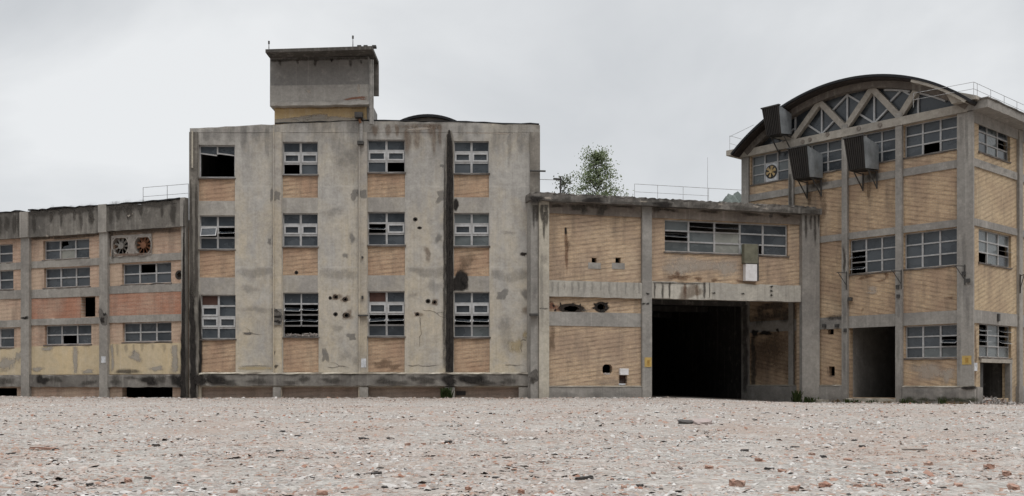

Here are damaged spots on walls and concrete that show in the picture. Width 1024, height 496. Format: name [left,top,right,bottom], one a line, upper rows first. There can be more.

damp [31,184,236,398]
damp [377,130,513,391]
spalling [549,302,609,313]
damp [530,196,675,236]